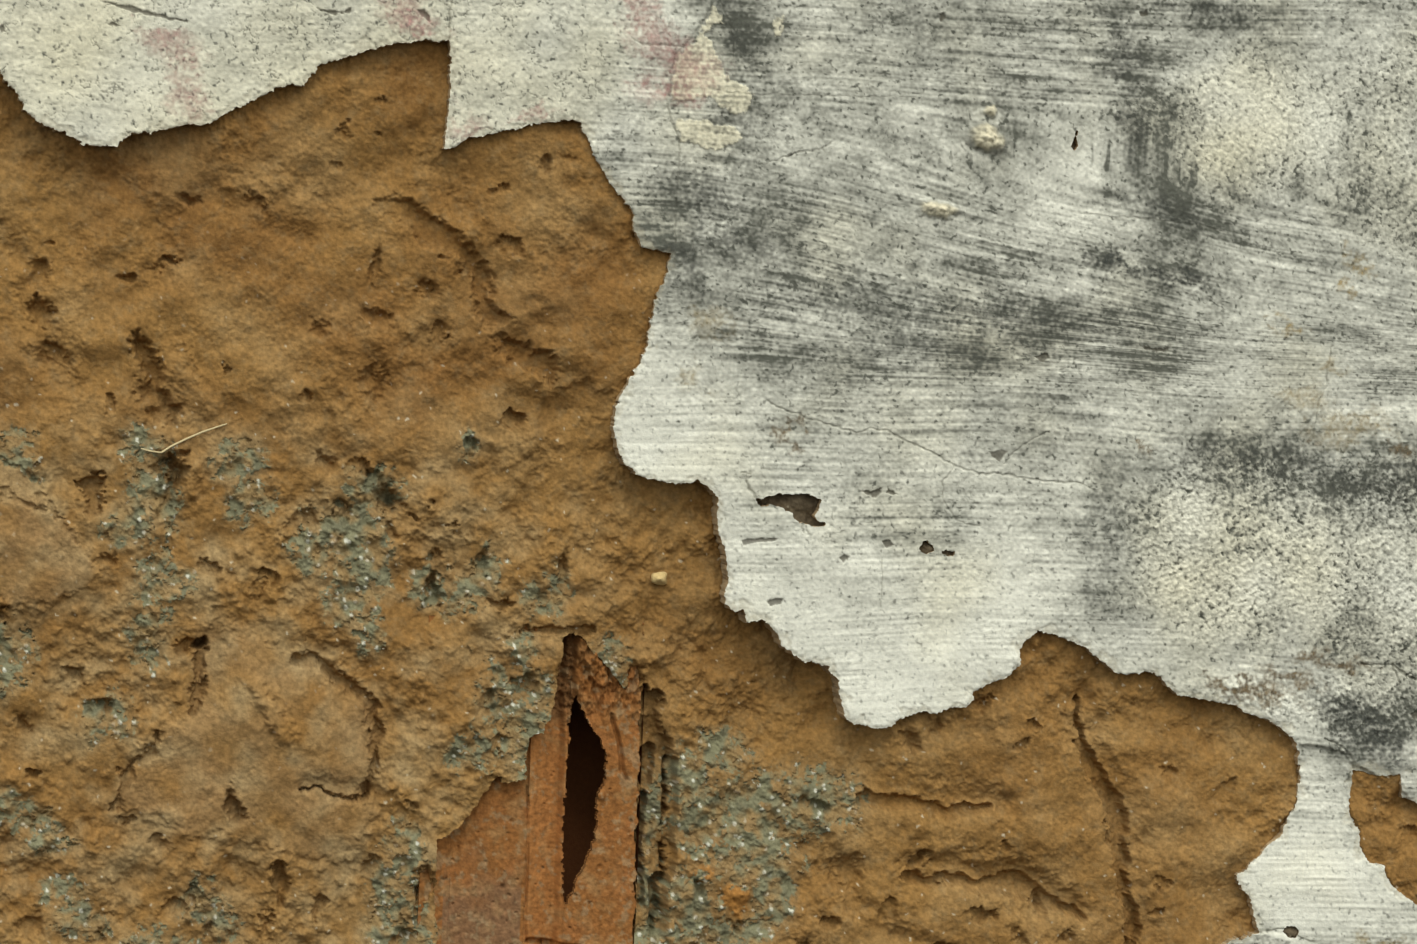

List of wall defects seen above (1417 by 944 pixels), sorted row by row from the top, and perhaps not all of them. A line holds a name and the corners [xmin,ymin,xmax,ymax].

peeling [100,0,189,28]
peeling [417,9,434,27]
crack [631,0,736,246]
peeling [672,7,754,153]
peeling [742,538,781,547]
peeling [860,487,900,499]
crack [765,400,1095,529]
peeling [767,598,785,608]
spalling [561,696,607,902]
spalling [632,829,687,944]
spalling [672,826,770,926]
spalling [1349,770,1417,905]